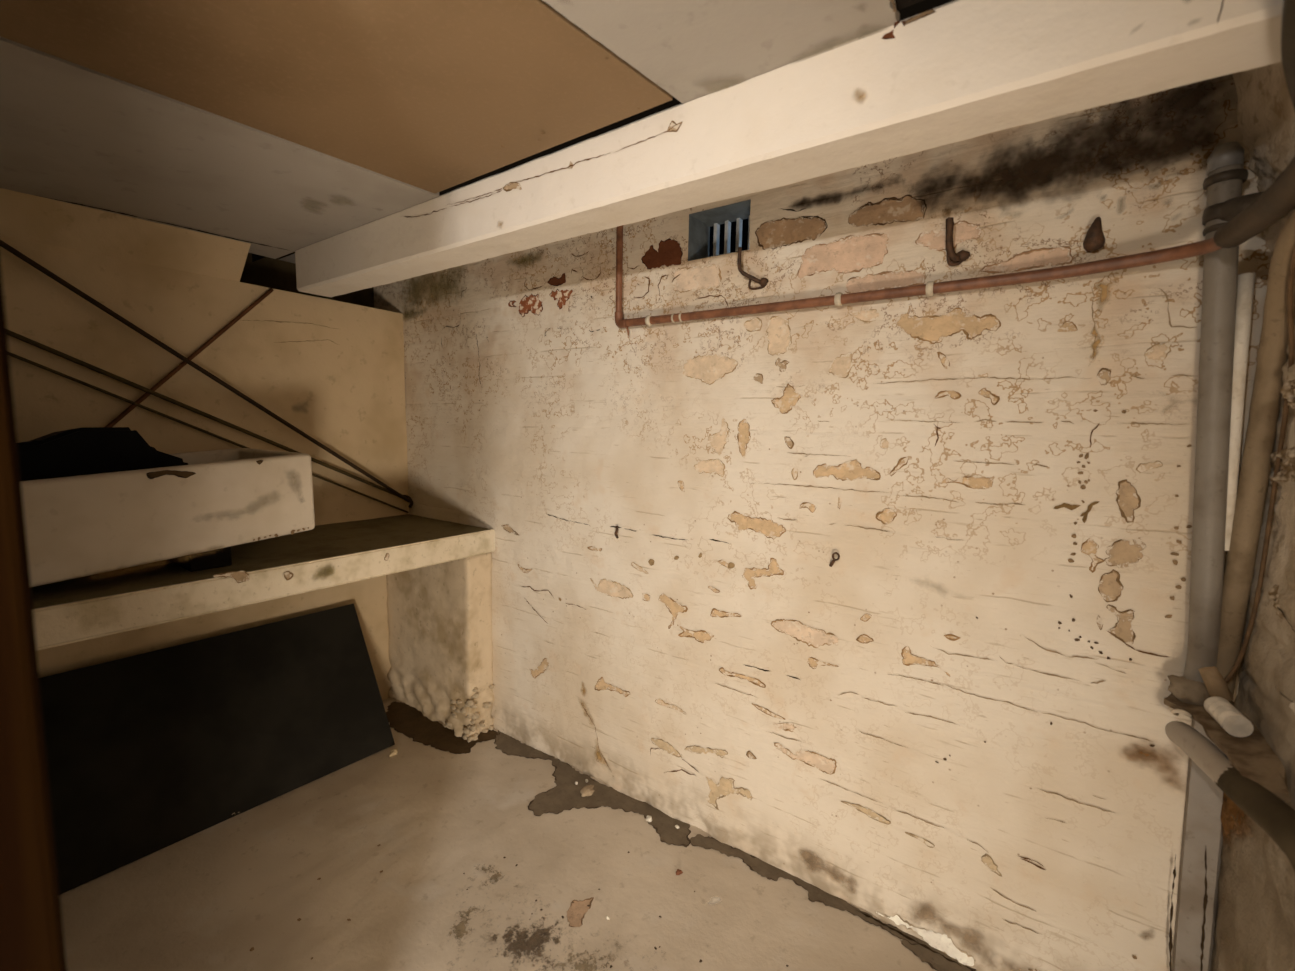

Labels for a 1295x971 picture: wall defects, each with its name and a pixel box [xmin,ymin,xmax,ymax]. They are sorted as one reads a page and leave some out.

spalling [881,2,905,39]
flaking render [641,195,981,293]
spalling [508,273,573,317]
peeling [895,307,1001,369]
peeling [791,457,909,509]
peeling [1116,461,1163,523]
peeling [728,511,786,540]
peeling [590,578,714,643]
peeling [718,558,784,590]
peeling [1058,537,1146,661]
water stain [801,851,853,890]
water stain [915,906,988,958]